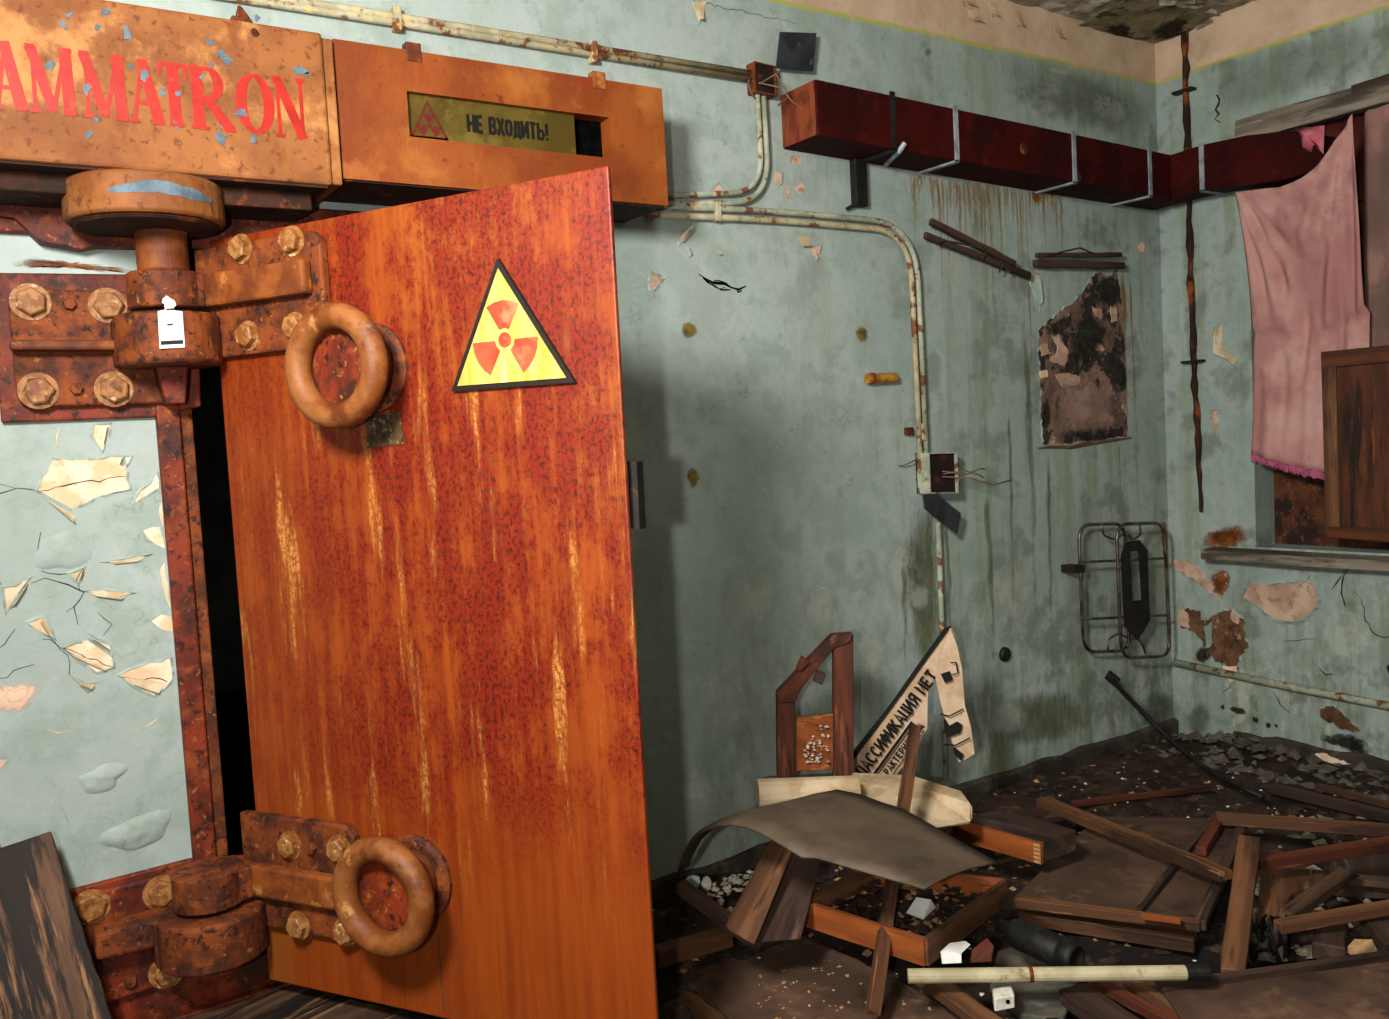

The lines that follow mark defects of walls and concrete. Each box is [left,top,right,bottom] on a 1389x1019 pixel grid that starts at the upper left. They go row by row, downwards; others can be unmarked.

water stain [1106,23,1130,36]
water stain [1153,18,1186,40]
corrosion [26,260,123,272]
peeling [34,422,173,632]
peeling [0,576,32,615]
crack [0,532,112,678]
spalling [1171,559,1322,682]
peeling [25,615,175,698]
peeling [0,684,36,711]